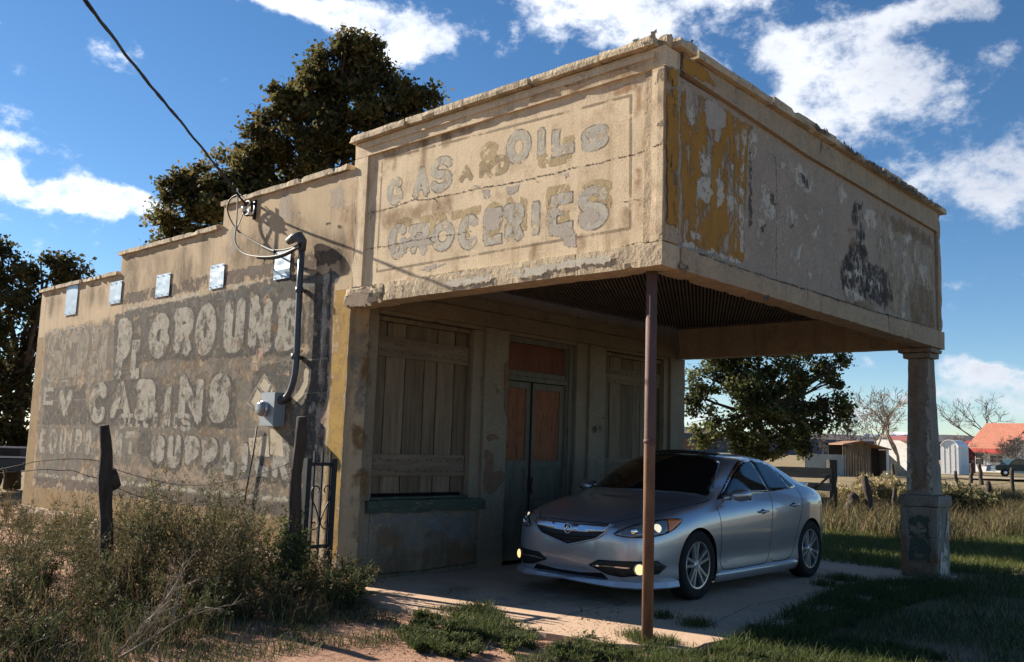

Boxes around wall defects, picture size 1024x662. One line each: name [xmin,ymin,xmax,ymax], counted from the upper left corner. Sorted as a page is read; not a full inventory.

crack [368,140,663,218]
peeling [655,57,776,265]
spalling [344,286,380,309]
peeling [443,273,491,288]
peeling [511,187,611,279]
peeling [844,260,881,302]
peeling [863,208,928,318]